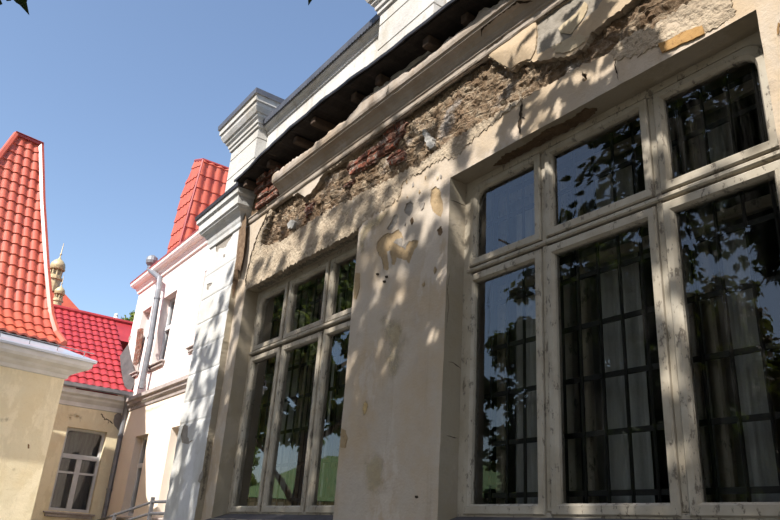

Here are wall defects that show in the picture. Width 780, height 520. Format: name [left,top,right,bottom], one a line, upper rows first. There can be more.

crack [323,0,567,173]
spalling [246,0,737,290]